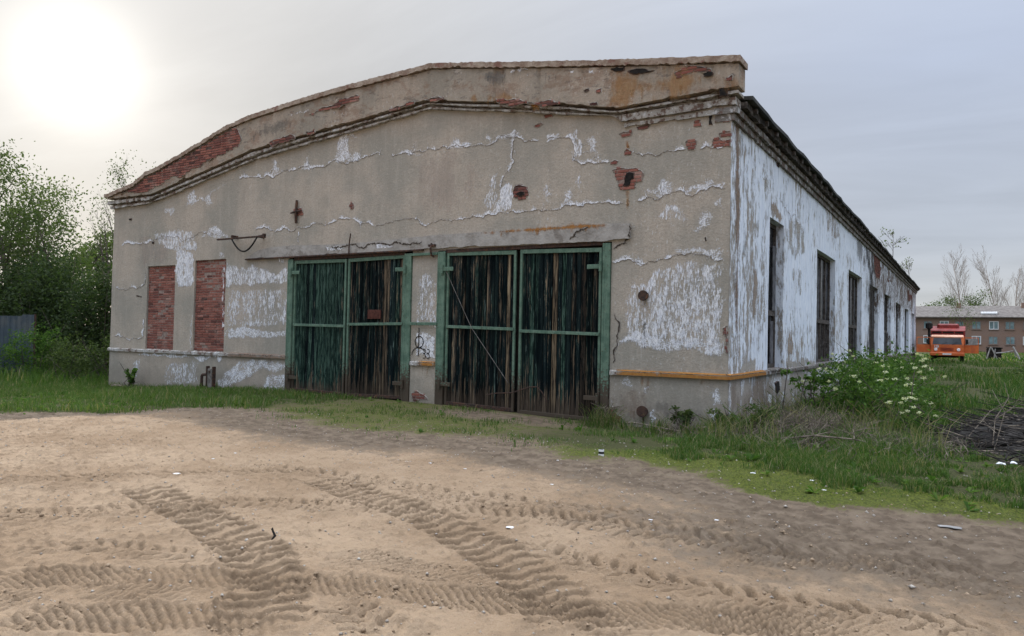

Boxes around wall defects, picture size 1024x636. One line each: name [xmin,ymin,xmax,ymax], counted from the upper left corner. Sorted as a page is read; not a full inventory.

flaking render [291,95,360,116]
flaking render [675,65,733,97]
flaking render [121,127,242,195]
flaking render [133,226,288,388]
crack [240,131,726,265]
peeling [484,175,529,213]
corrosion [506,223,604,232]
flaking render [572,124,685,220]
peeling [620,180,756,421]
peeling [753,269,766,322]
peeling [771,203,806,295]
flaking render [873,254,891,282]